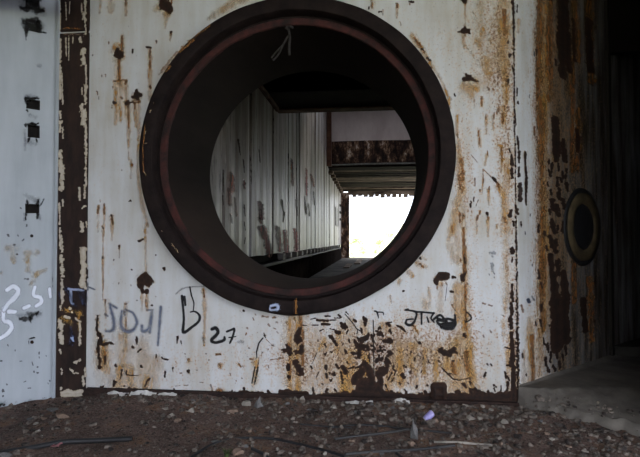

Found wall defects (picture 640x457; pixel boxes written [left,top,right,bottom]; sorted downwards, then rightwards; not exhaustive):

rust [499,9,508,50]
peeling [554,0,577,80]
peeling [59,0,90,209]
rust [111,79,127,121]
peeling [57,149,82,354]
peeling [78,247,88,289]
rust [449,169,508,347]
peeling [543,115,572,373]
peeling [60,358,87,397]
rust [216,299,354,396]
rust [386,342,518,402]